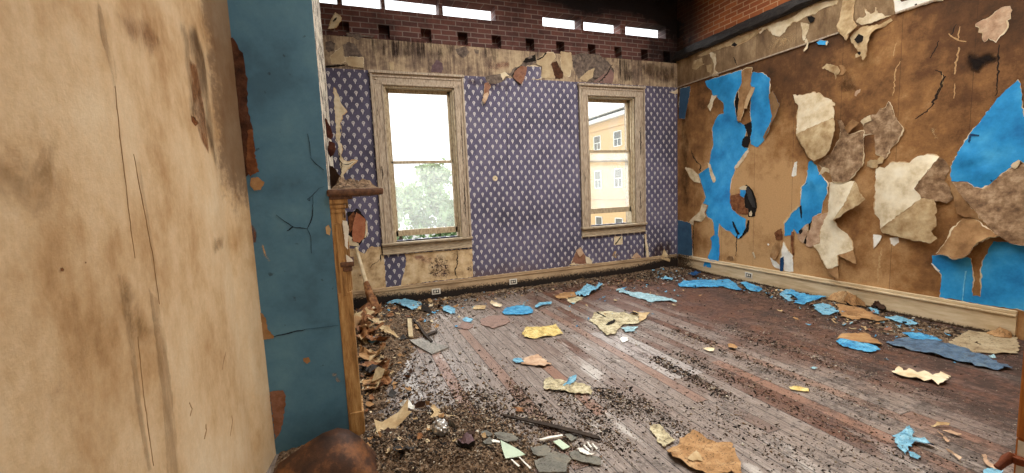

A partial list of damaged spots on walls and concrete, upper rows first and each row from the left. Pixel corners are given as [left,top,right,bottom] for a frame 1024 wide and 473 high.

damp [190,32,214,150]
flaking render [231,37,264,191]
crack [276,134,343,253]
peeling [325,118,336,167]
flaking render [485,51,614,85]
peeling [596,0,839,301]
crack [915,25,966,119]
peeling [950,80,1024,188]
peeling [931,241,1024,311]
crack [274,325,338,337]